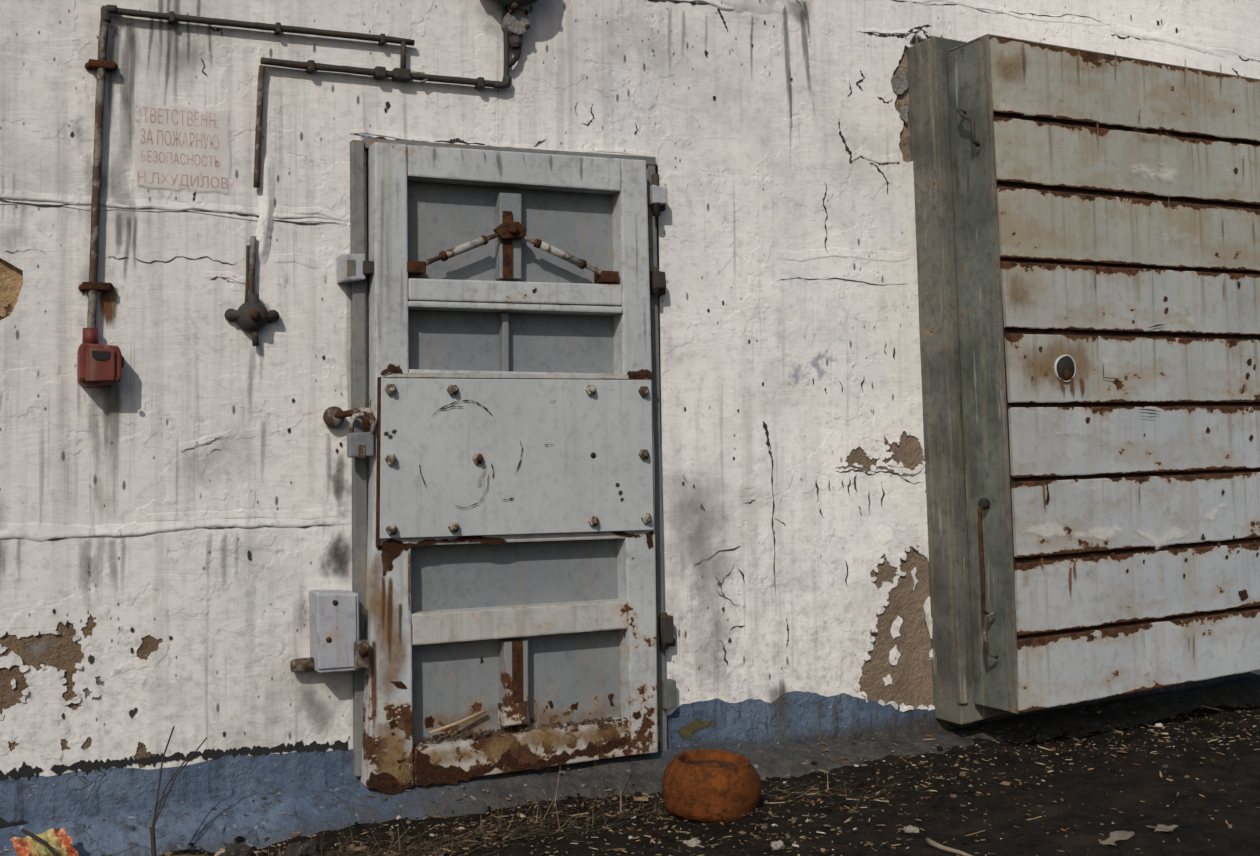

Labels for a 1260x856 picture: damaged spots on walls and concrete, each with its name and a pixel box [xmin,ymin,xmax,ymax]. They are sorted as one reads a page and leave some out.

crack [648,0,750,32]
crack [857,0,1140,40]
crack [1212,47,1260,76]
flaking render [0,259,23,320]
peeling [815,430,925,517]
flaking render [854,543,935,712]
peeling [0,609,104,720]
peeling [61,737,92,751]
corrosion [366,701,641,795]